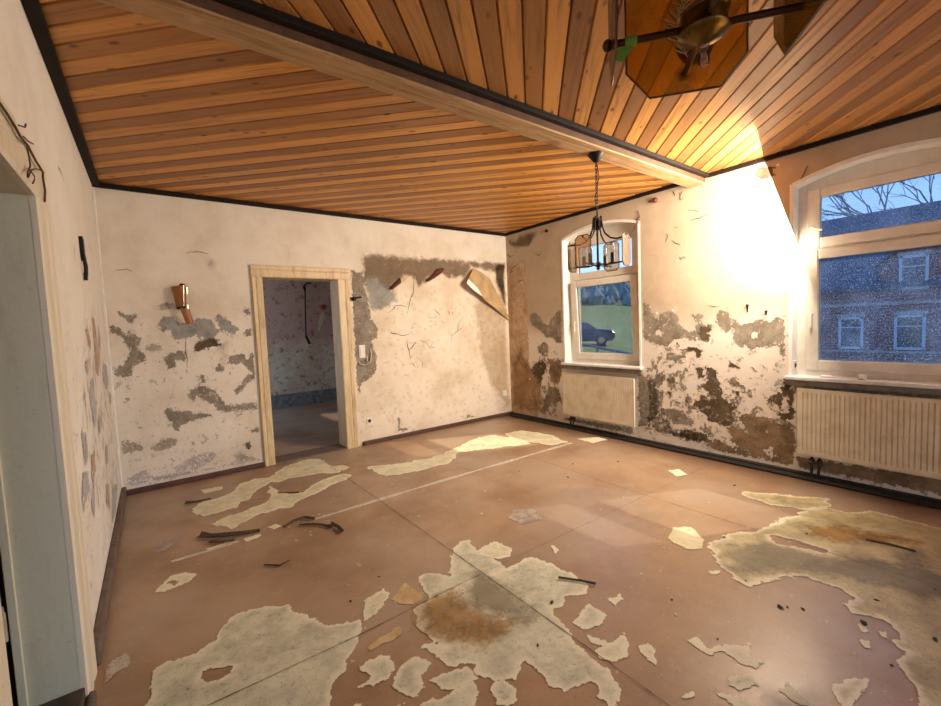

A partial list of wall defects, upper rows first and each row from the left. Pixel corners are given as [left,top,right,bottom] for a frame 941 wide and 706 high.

peeling [755,163,779,184]
damp [509,234,534,246]
peeling [348,268,381,393]
peeling [82,297,264,531]
peeling [529,303,941,496]
peeling [367,430,568,476]
peeling [192,458,351,529]
peeling [207,524,282,550]
peeling [144,540,657,706]
corrosion [420,592,513,643]
peeling [668,491,941,706]
peeling [104,652,137,683]